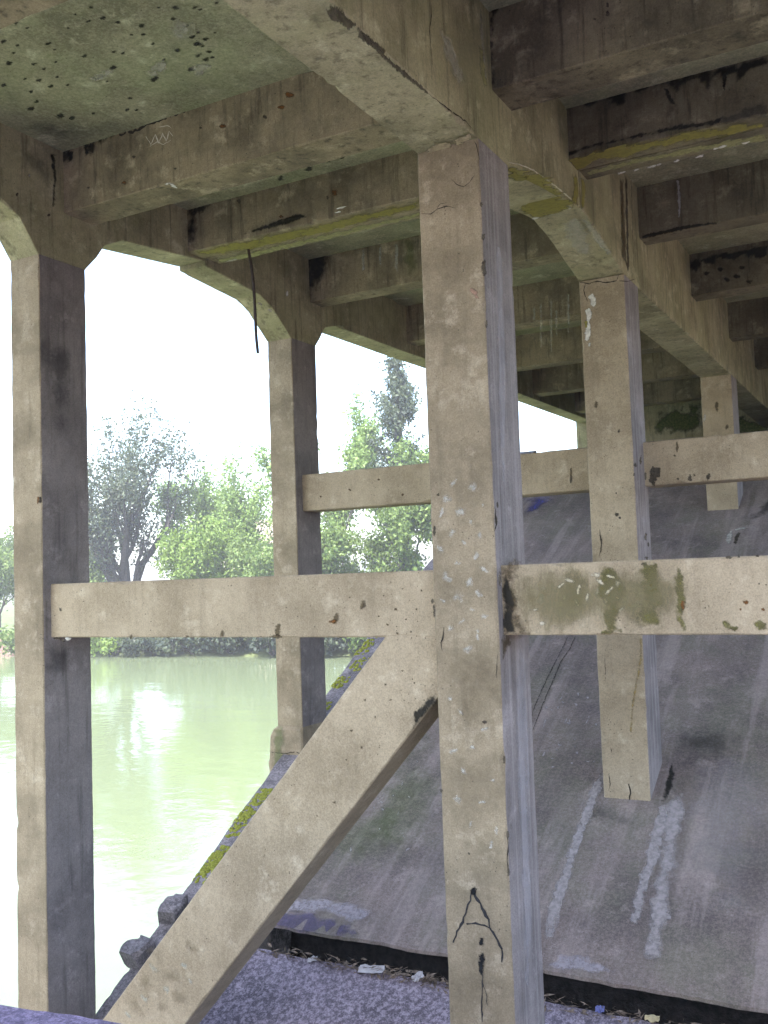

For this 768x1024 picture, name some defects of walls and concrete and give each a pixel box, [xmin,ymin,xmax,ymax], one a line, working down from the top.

damp [675,568,686,630]
damp [546,779,602,937]
damp [631,765,684,956]